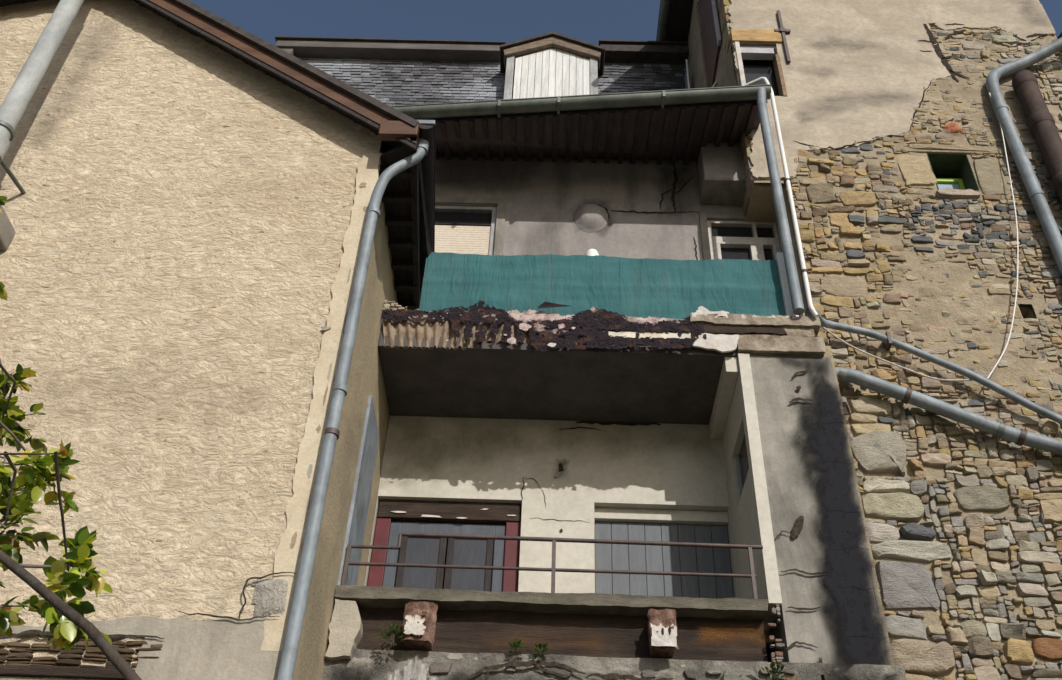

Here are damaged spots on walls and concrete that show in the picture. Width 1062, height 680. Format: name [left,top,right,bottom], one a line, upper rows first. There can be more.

crack [918,23,1048,82]
crack [611,165,695,214]
spalling [381,300,739,353]
crack [521,478,585,522]
leakage [782,356,891,680]
spalling [347,657,372,668]
spalling [573,667,642,676]
spalling [655,668,686,678]